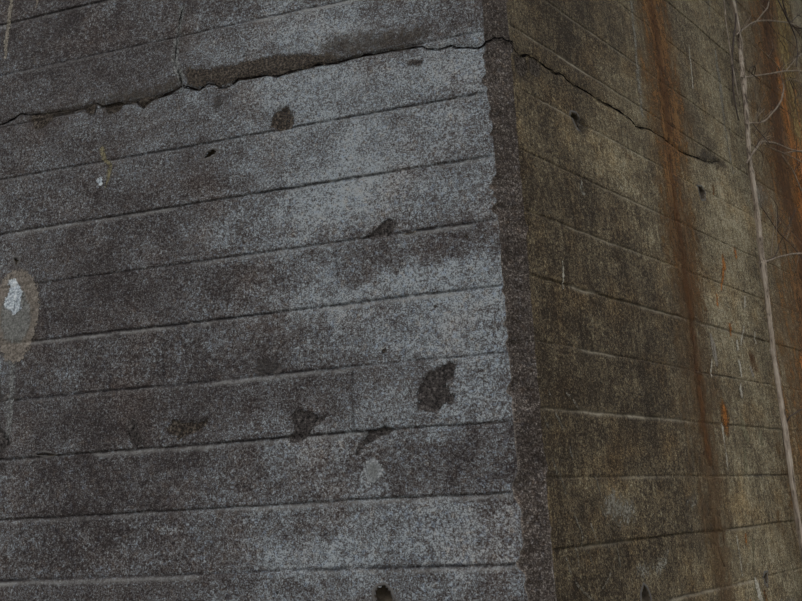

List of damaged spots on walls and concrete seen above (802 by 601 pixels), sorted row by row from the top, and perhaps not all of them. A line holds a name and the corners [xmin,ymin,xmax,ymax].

leakage [3,0,13,59]
spalling [28,26,428,132]
crack [0,6,716,163]
rust [740,0,802,533]
peeling [417,362,457,413]